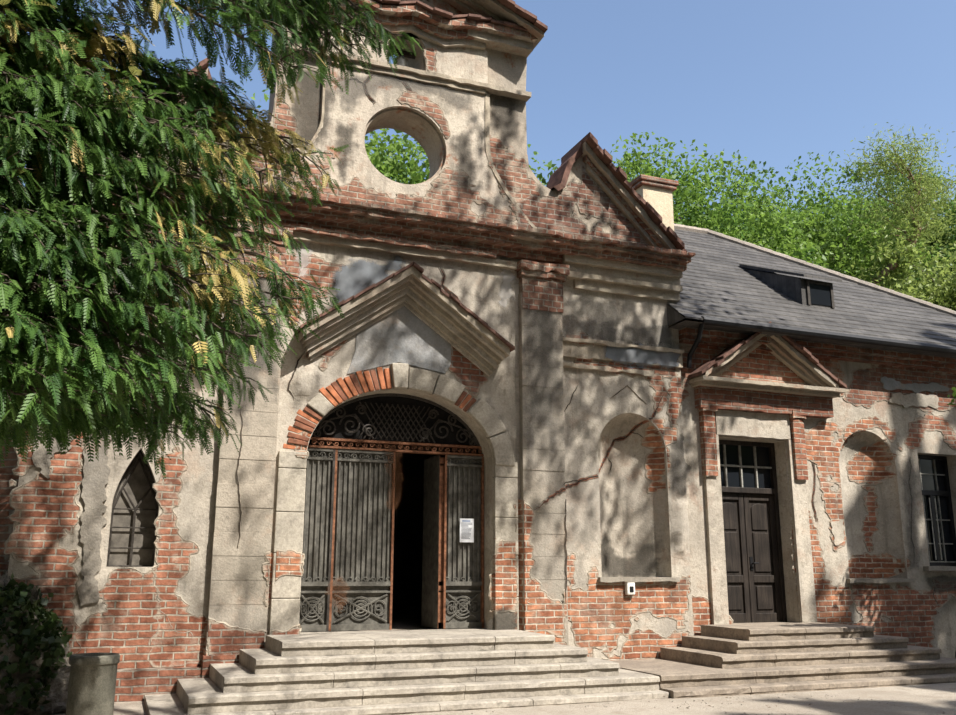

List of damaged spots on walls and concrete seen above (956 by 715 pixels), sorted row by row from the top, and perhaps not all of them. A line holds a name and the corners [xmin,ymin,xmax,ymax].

spalling [247,90,651,246]
spalling [4,423,305,669]
crack [235,407,243,548]
spalling [448,345,488,397]
crack [533,385,665,603]
spalling [488,498,712,661]
spalling [563,331,723,494]
spalling [790,505,799,614]
crack [810,460,818,521]
spalling [804,358,956,648]